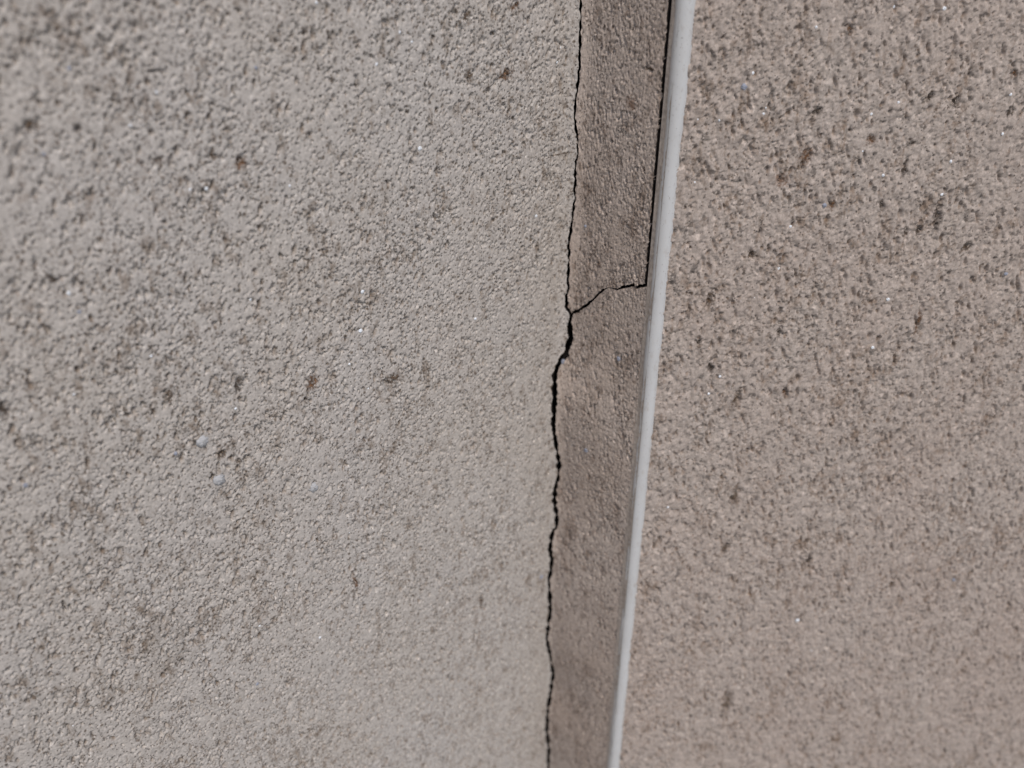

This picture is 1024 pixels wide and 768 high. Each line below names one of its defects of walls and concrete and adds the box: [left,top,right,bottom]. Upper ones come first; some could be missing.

crack [544,0,646,768]